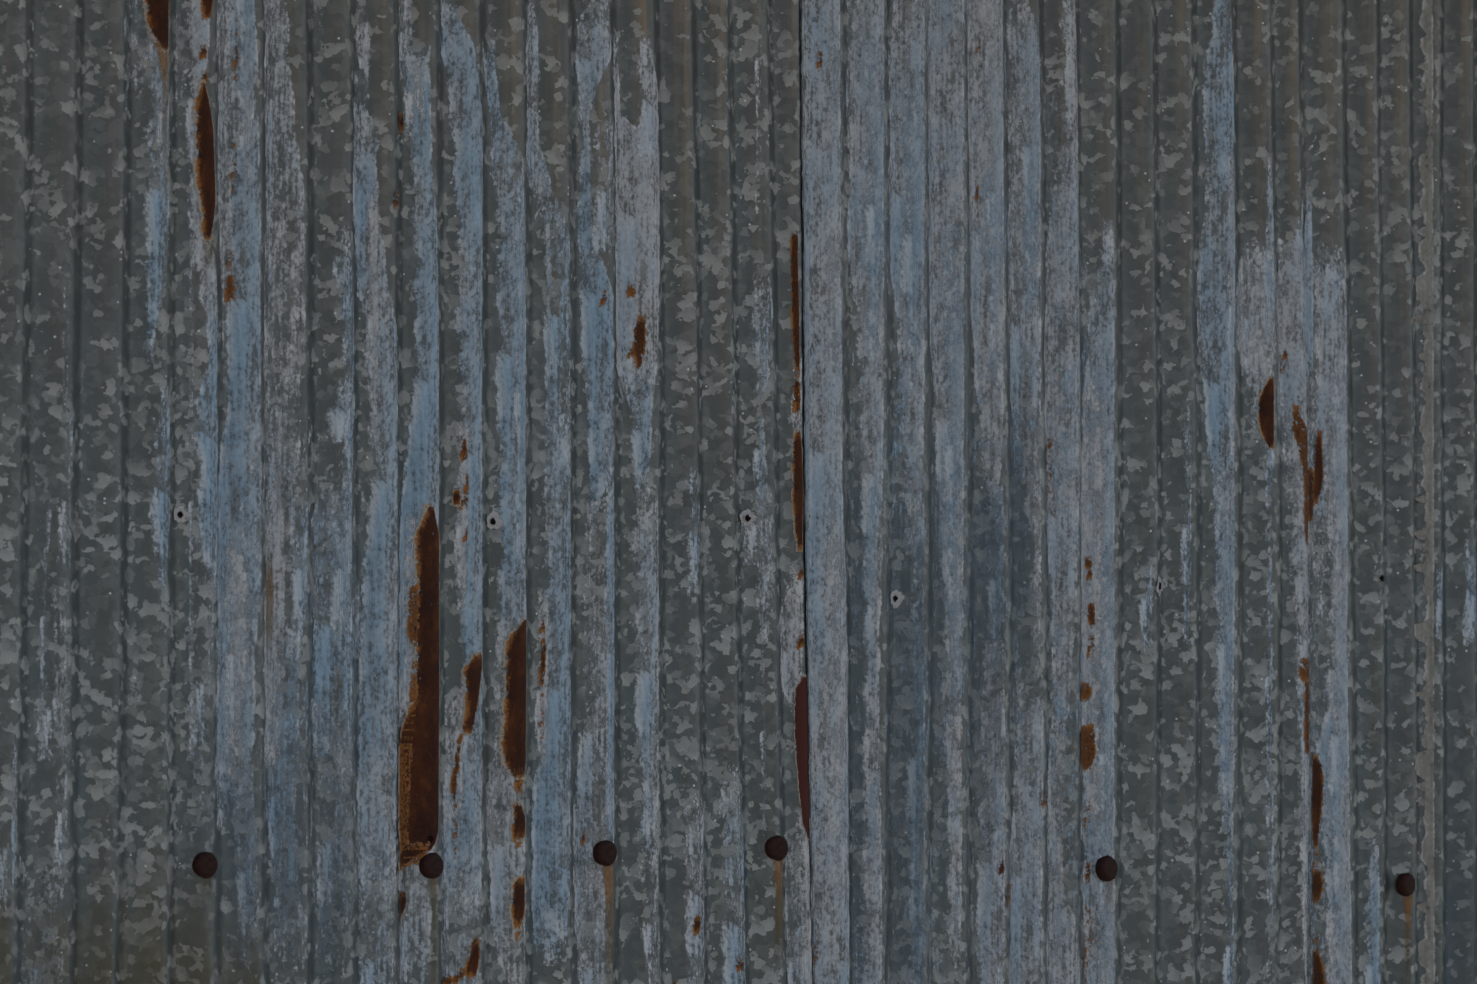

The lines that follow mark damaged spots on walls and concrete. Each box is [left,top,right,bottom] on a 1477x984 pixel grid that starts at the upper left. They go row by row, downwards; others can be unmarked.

rust [142,0,169,76]
rust [200,0,213,21]
rust [191,44,237,241]
rust [224,251,236,304]
rust [451,439,469,510]
rust [627,315,647,369]
rust [789,230,804,580]
rust [1257,348,1288,450]
rust [1292,404,1324,545]
rust [398,504,482,872]
rust [498,617,546,849]
rust [793,675,812,840]